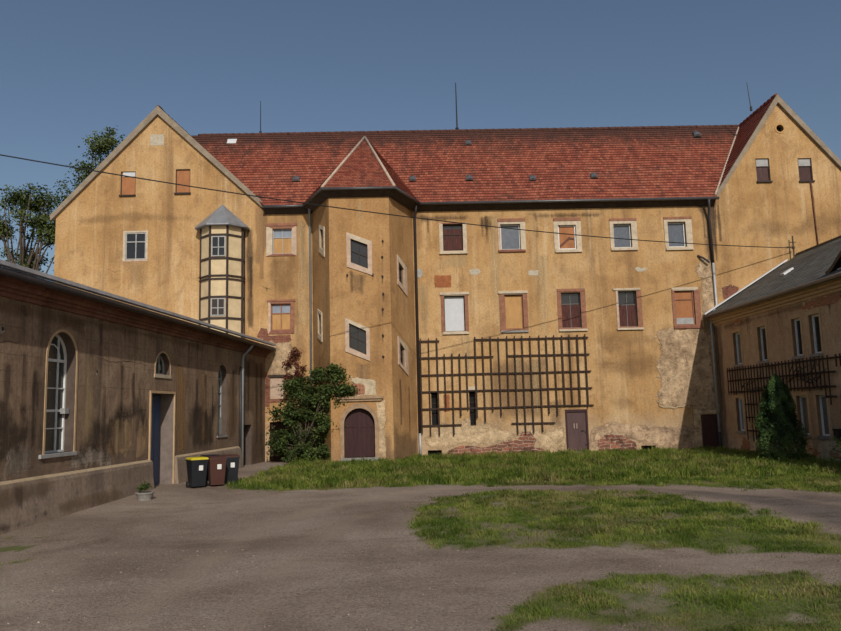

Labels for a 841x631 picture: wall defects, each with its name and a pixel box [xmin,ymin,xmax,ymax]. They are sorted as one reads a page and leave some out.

flaking render [589,258,739,451]
leakage [69,375,145,468]
flaking render [425,417,566,455]